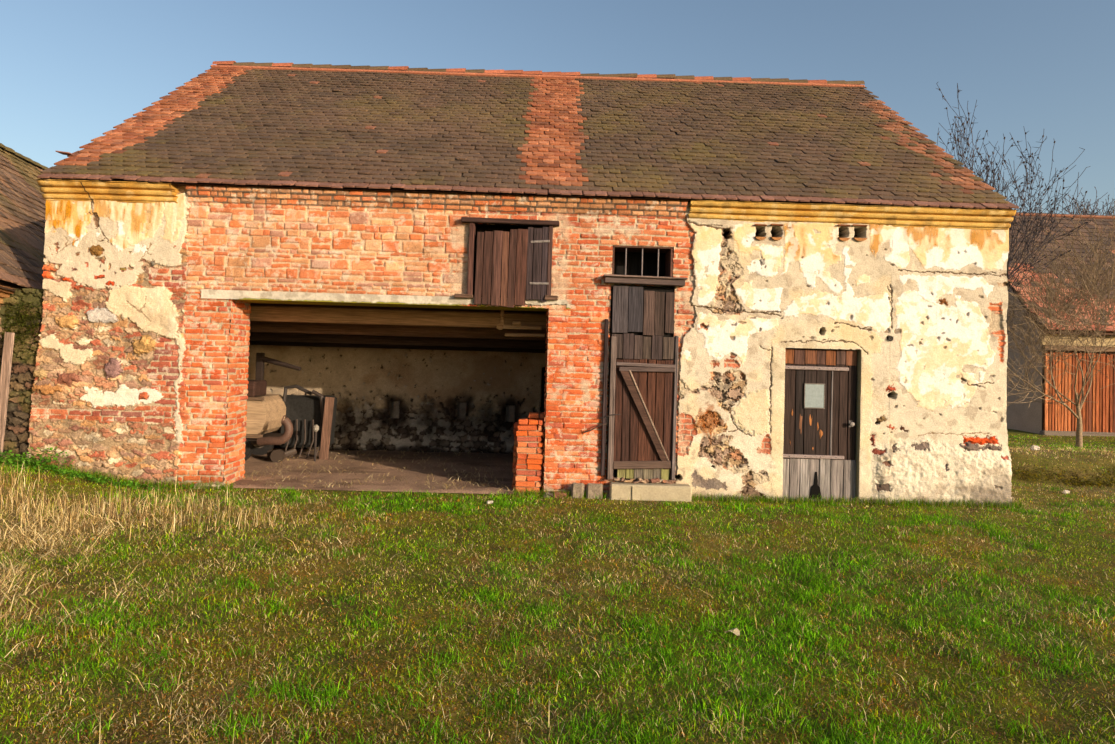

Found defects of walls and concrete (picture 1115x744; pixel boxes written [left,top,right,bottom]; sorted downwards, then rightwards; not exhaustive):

water stain [45,200,81,246]
crack [65,183,109,247]
water stain [870,224,883,254]
water stain [905,225,938,245]
water stain [971,229,1000,248]
peeling [39,192,191,444]
peeling [677,222,1009,498]